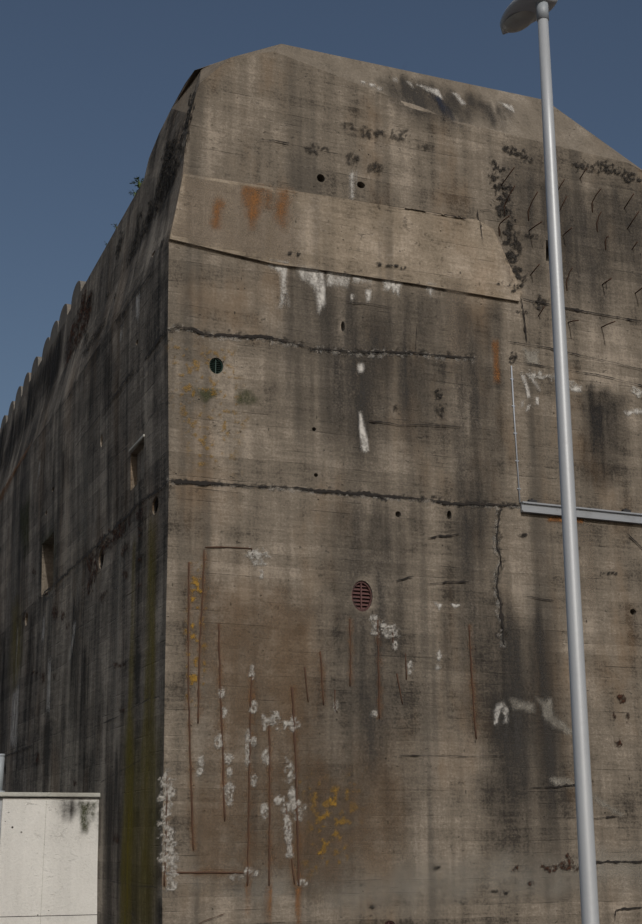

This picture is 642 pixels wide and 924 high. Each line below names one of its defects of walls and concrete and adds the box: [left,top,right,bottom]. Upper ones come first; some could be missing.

water stain [389,77,514,125]
water stain [176,177,295,304]
crack [1,238,475,490]
water stain [299,269,425,454]
crack [0,479,527,645]
rust [163,675,252,886]
rust [187,546,253,851]
water stain [201,595,325,875]
rust [285,687,300,915]
water stain [492,609,572,800]
crack [533,782,575,790]
crack [596,857,642,865]